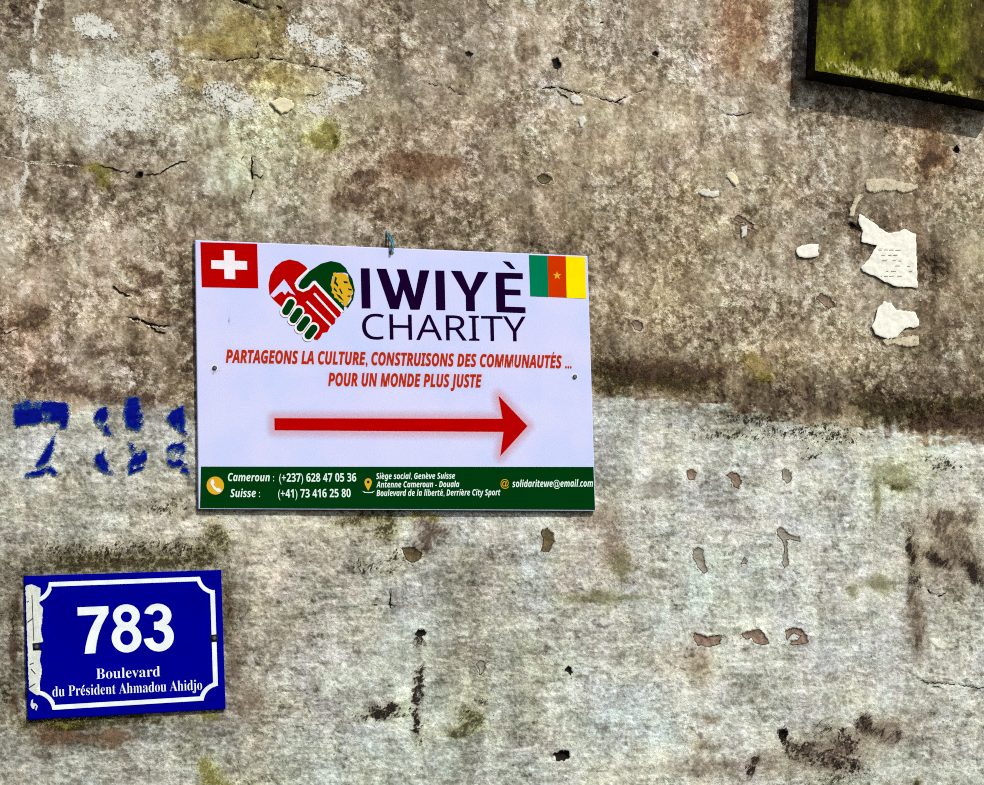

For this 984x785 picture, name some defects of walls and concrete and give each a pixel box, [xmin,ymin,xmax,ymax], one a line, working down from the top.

crack [231,0,282,12]
crack [1,156,187,175]
water stain [592,358,721,394]
water stain [852,388,984,434]
spalling [541,527,557,552]
spalling [775,525,802,568]
water stain [907,504,984,646]
spalling [692,631,724,649]
spalling [741,629,769,645]
spalling [785,626,810,646]
water stain [745,748,762,780]
water stain [777,712,914,785]